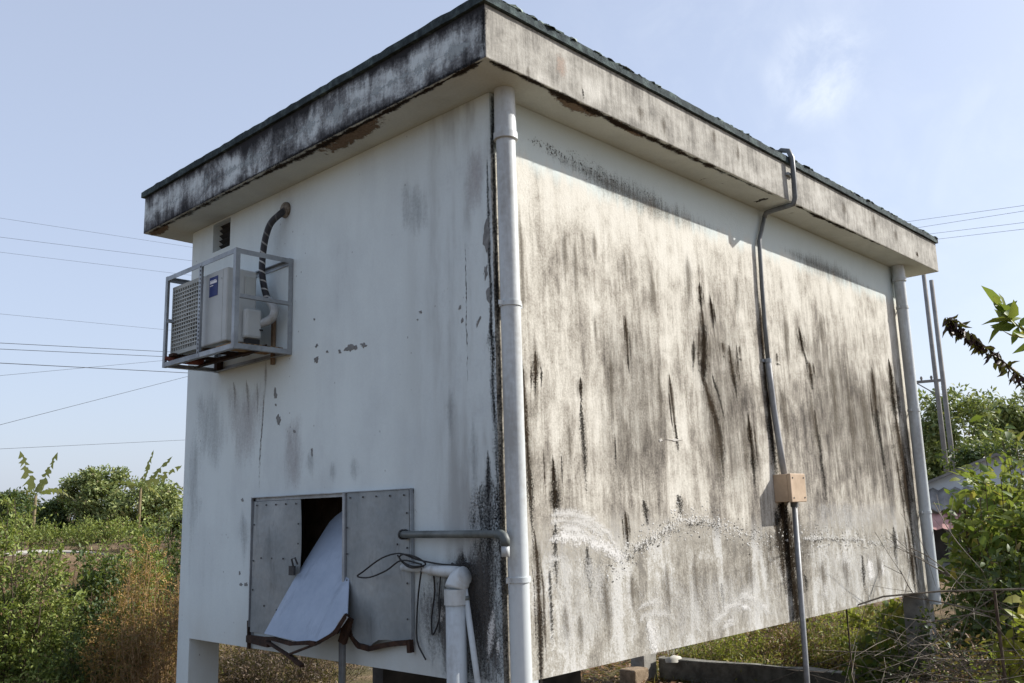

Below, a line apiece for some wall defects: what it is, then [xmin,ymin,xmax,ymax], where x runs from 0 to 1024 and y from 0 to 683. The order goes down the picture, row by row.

water stain [149,9,771,236]
water stain [796,206,886,248]
peeling [314,343,367,363]
water stain [456,99,510,680]
water stain [687,267,742,485]
water stain [743,308,816,489]
water stain [424,586,446,659]
water stain [522,351,919,682]